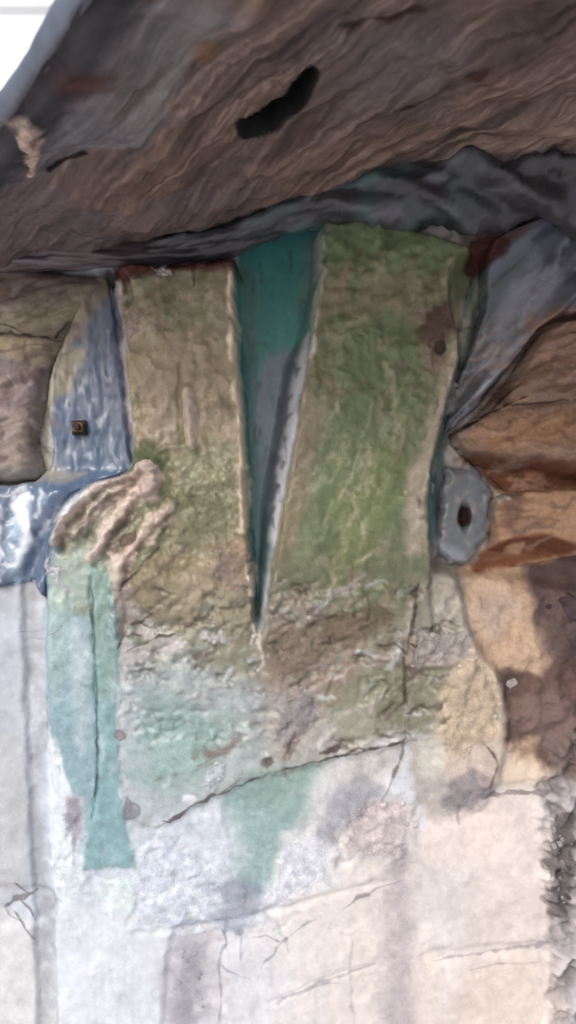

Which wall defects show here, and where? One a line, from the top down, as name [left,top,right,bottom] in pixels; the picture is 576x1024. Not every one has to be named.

rust [465,236,509,284]
crack [397,585,418,701]
crack [164,740,404,823]
crack [5,883,39,938]